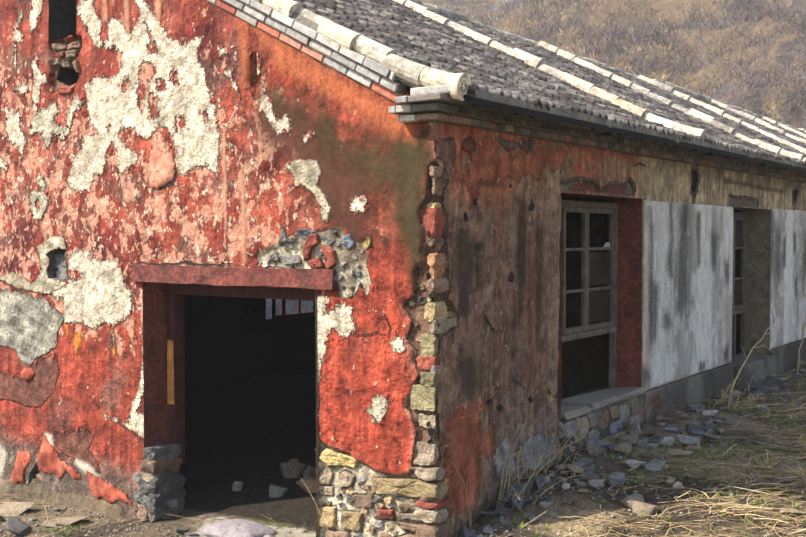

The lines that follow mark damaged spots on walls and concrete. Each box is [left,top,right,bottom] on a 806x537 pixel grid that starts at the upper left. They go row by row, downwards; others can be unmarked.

peeling [3,0,221,194]
peeling [216,44,242,101]
peeling [248,50,292,135]
water stain [239,18,426,279]
peeling [0,233,132,409]
flaking render [253,159,374,420]
flaking render [315,132,557,537]
water stain [458,230,482,321]
water stain [649,210,671,343]
water stain [667,199,729,317]
water stain [771,212,806,296]
flaking render [10,327,186,522]